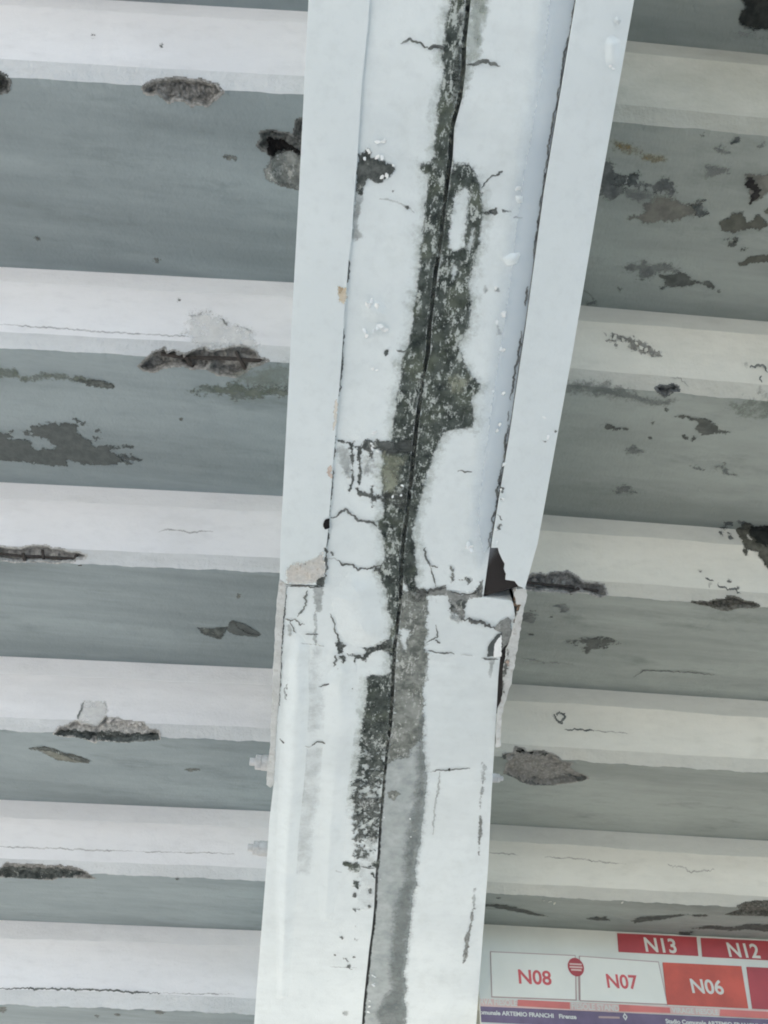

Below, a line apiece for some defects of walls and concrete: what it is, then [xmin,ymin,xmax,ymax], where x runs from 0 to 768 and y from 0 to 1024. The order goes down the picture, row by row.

spalling [141,76,225,108]
spalling [256,117,303,190]
crack [533,0,576,259]
leakage [0,369,114,389]
spalling [137,344,270,378]
leakage [190,382,288,400]
crack [487,331,522,549]
leakage [343,0,500,1024]
crack [279,436,382,706]
crack [414,547,495,654]
spalling [29,716,161,763]
spalling [0,861,96,881]